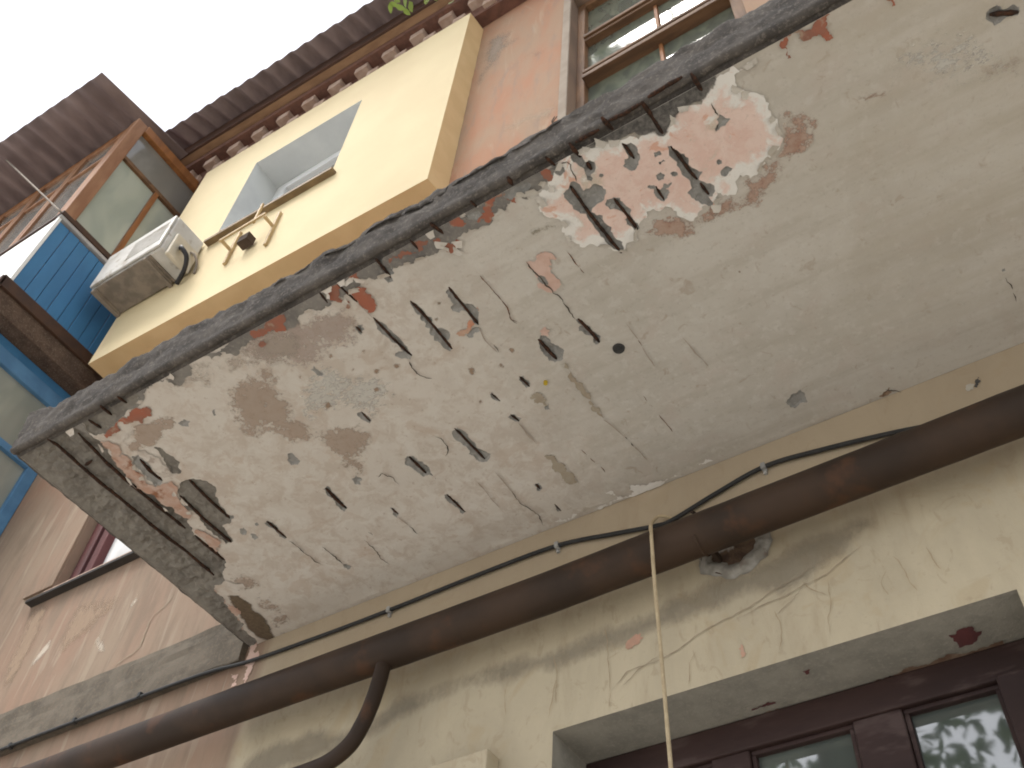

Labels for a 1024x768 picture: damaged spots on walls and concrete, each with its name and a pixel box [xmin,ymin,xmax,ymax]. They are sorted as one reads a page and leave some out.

spalling [986,4,1020,25]
peeling [779,14,833,59]
corrosion [702,112,816,222]
peeling [206,56,783,359]
corrosion [647,217,695,237]
spalling [452,427,491,462]
spalling [405,456,436,479]
spalling [324,486,347,512]
spalling [444,494,466,514]
spalling [20,365,287,687]
crack [605,547,860,704]
peeling [949,626,982,648]